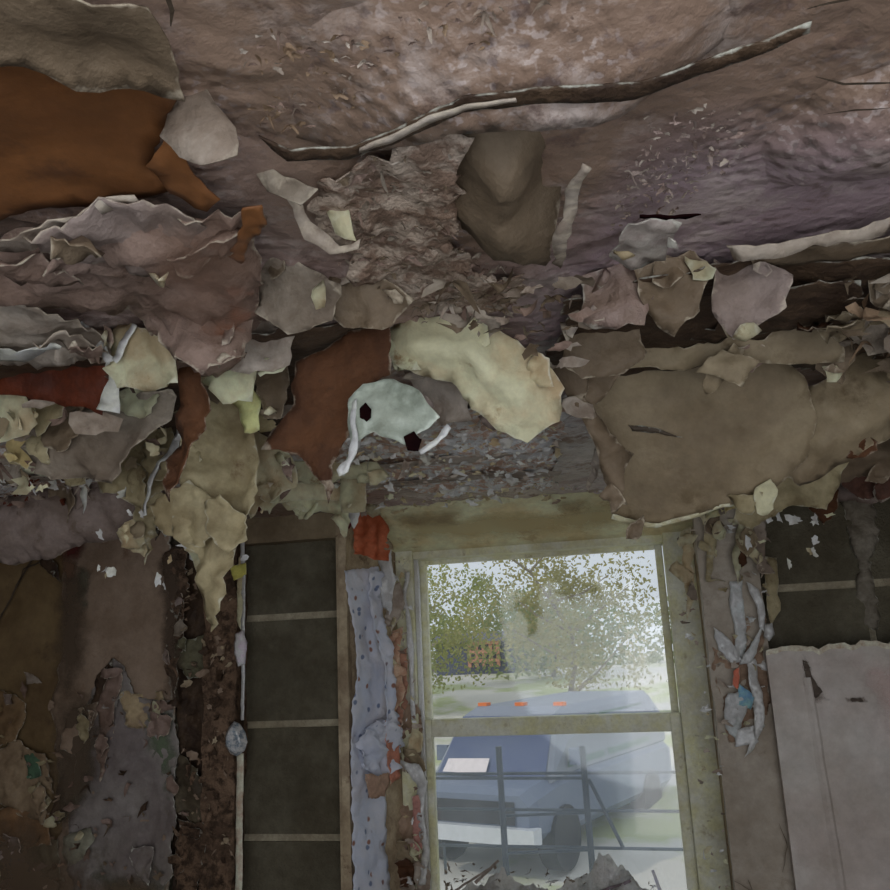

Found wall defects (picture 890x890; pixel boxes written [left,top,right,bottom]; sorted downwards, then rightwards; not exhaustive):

peeling [0,0,239,253]
peeling [240,0,504,135]
peeling [609,103,752,283]
peeling [0,359,123,508]
peeling [145,383,180,447]
flaking render [0,542,247,890]